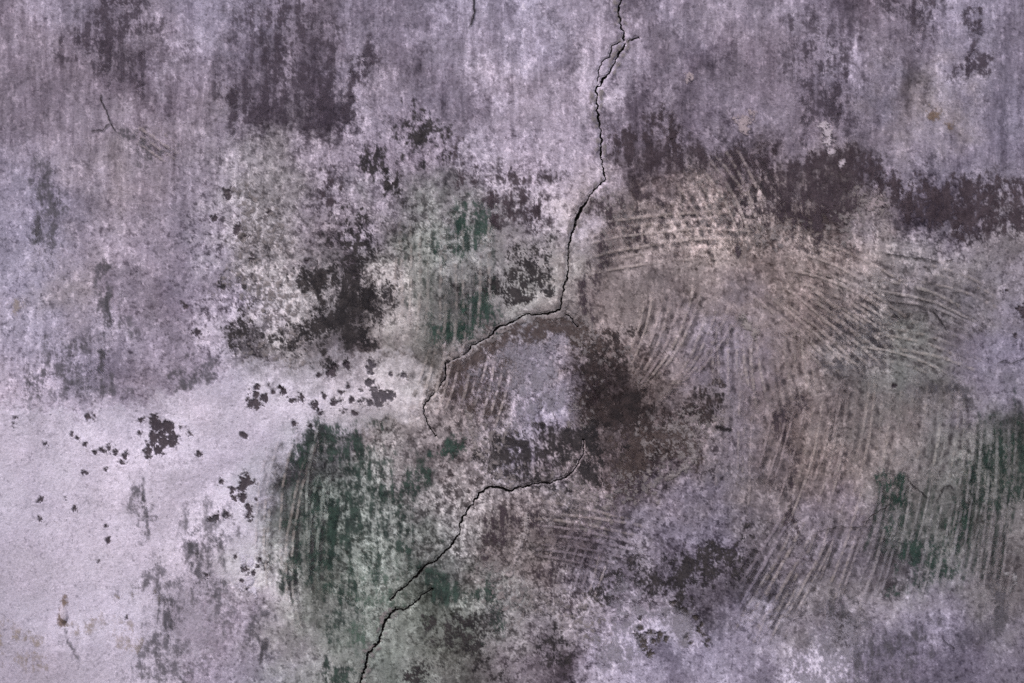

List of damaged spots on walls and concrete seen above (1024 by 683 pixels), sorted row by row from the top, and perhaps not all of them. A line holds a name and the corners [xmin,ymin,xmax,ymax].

crack [421,0,639,436]
leakage [356,6,1024,498]
leakage [882,0,945,30]
crack [357,440,586,683]